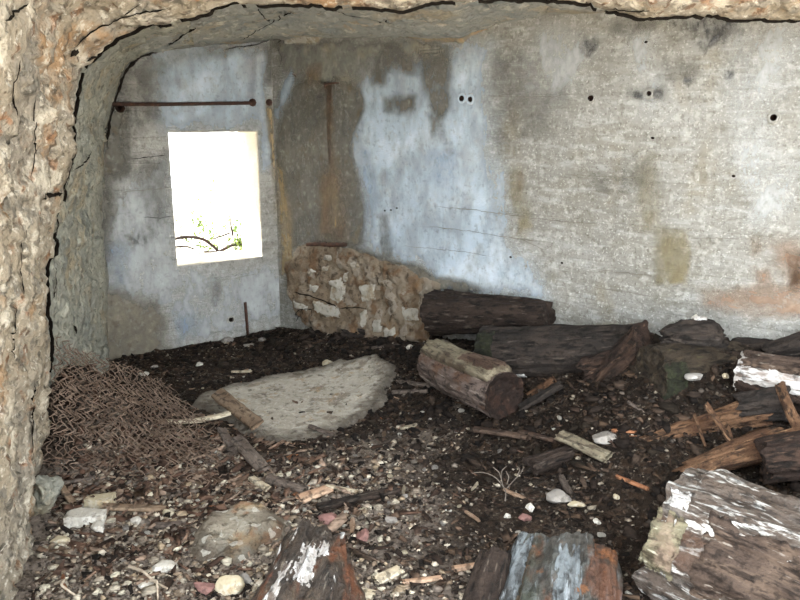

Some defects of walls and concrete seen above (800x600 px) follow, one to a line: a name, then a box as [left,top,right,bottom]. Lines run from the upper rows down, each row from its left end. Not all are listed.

crack [12,61,37,176]
crack [31,1,456,455]
leakage [155,38,538,294]
crack [478,0,800,23]